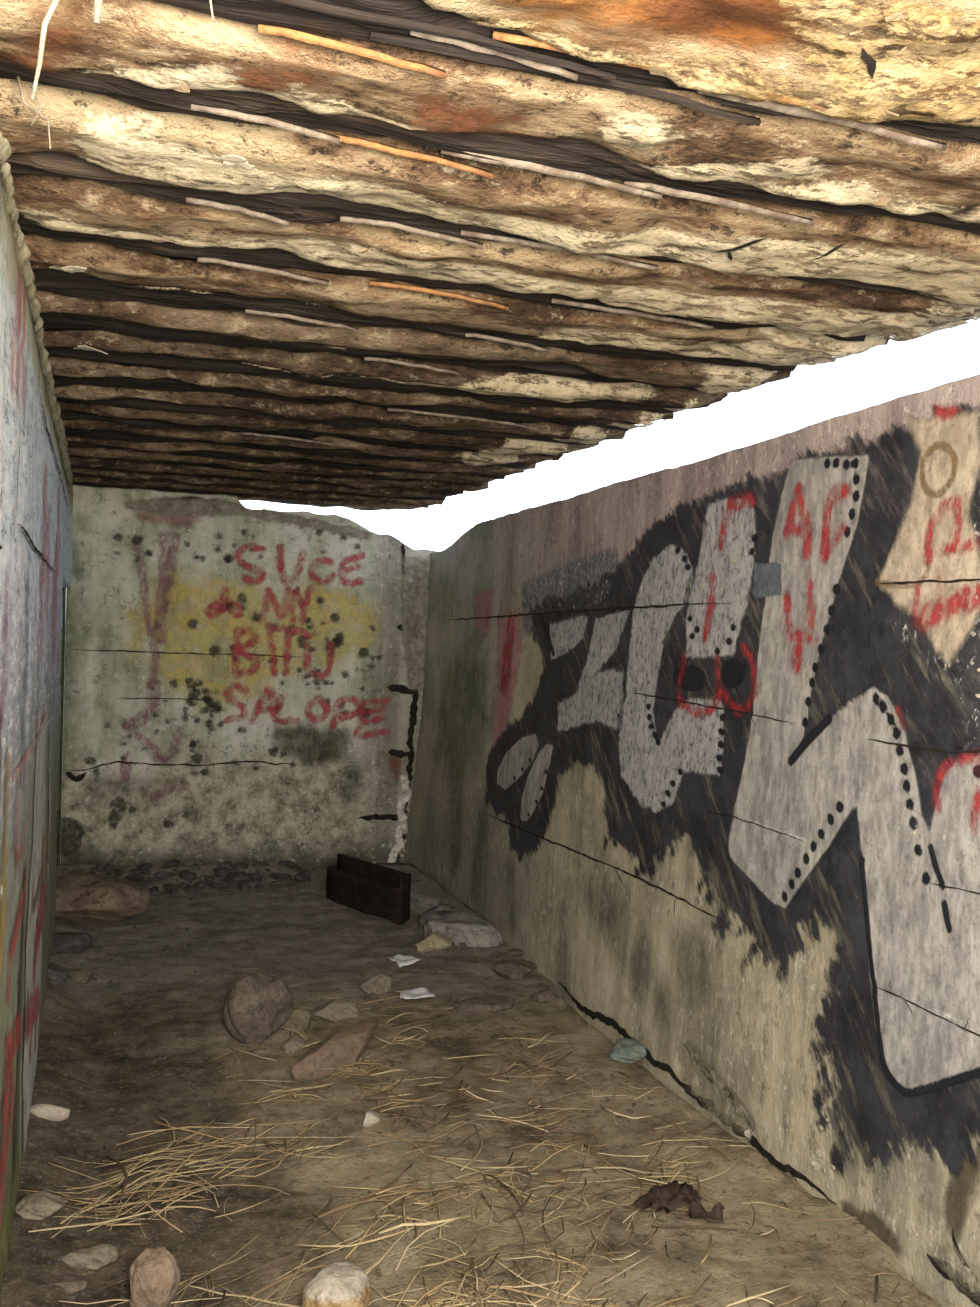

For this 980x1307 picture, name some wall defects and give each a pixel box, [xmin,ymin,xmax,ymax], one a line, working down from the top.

rust [490,0,816,48]
peeling [83,62,428,130]
peeling [477,0,980,127]
rust [911,37,980,97]
peeling [0,106,980,494]
crack [0,524,55,572]
water stain [0,467,111,878]
water stain [108,797,135,829]
crack [557,981,837,1205]